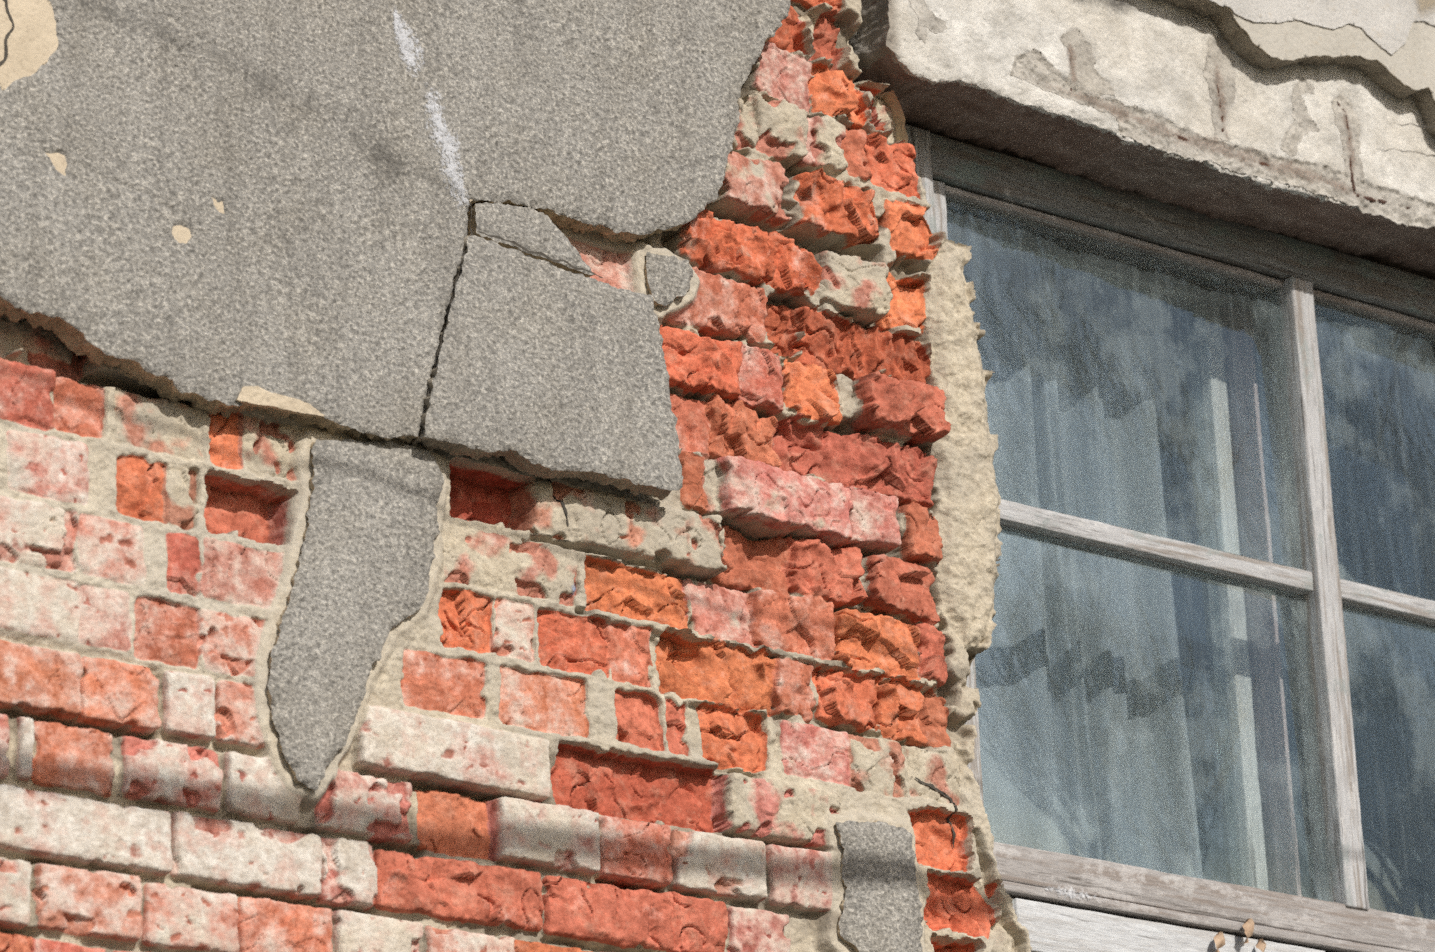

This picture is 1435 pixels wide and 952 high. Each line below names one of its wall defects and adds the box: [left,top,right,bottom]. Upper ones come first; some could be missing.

crack [0,0,14,66]
flaking render [0,0,58,91]
spalling [1011,5,1435,229]
flaking render [46,153,67,176]
flaking render [172,225,192,244]
flaking render [212,198,224,214]
crack [420,195,603,436]
flaking render [235,386,324,418]
spalling [655,0,953,748]
spalling [373,849,728,952]
spalling [907,805,1004,952]